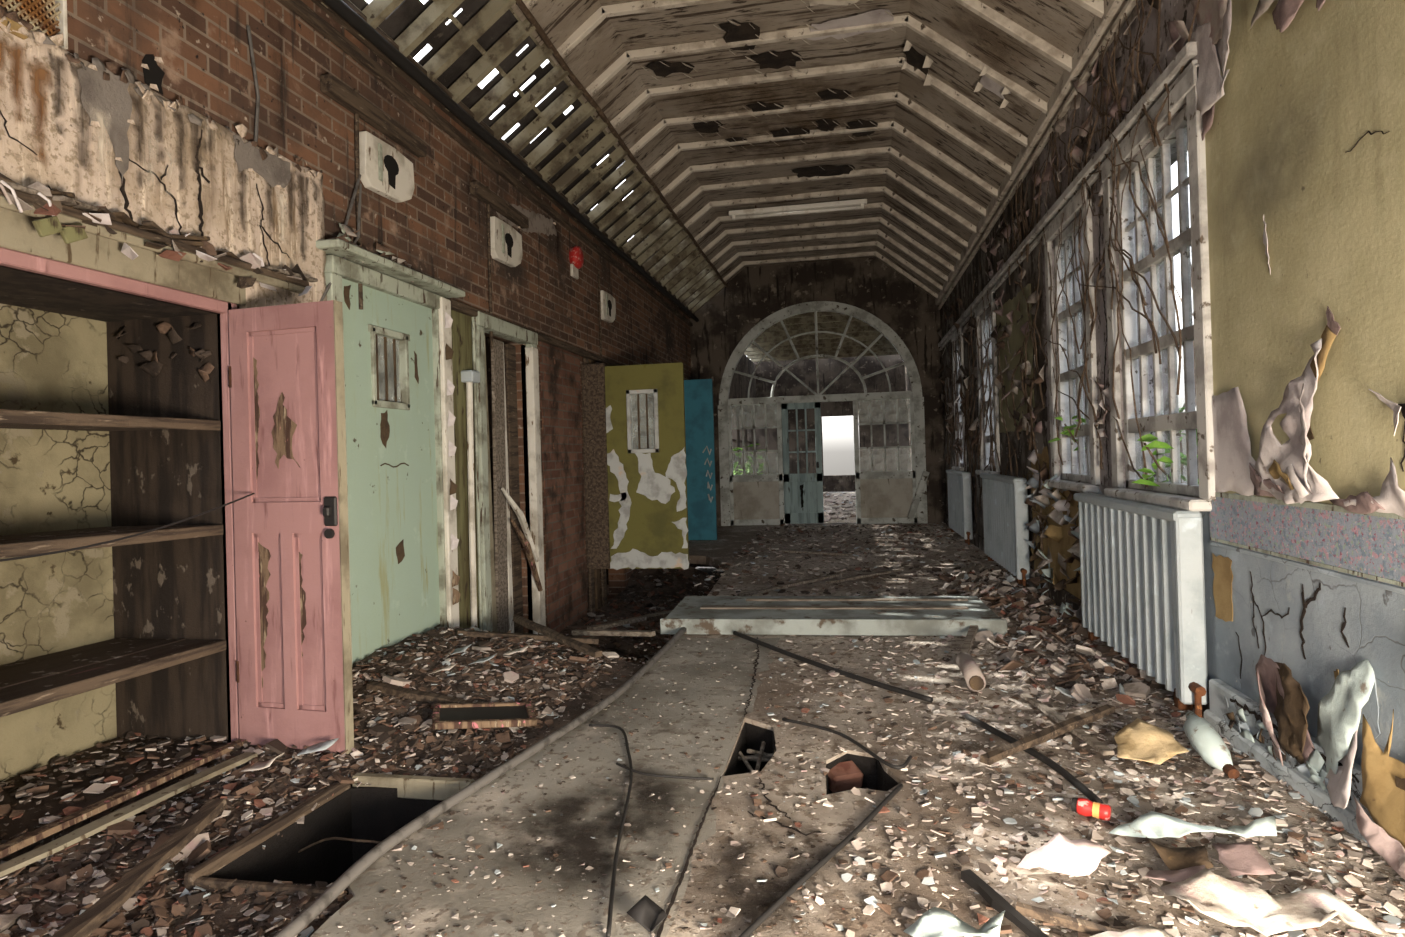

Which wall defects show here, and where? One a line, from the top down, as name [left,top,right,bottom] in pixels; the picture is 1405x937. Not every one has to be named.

water stain [50,54,103,165]
spalling [0,5,322,189]
water stain [131,95,212,188]
peeling [1123,0,1232,141]
peeling [1250,0,1326,33]
water stain [267,172,318,260]
peeling [937,56,1138,620]
peeling [607,447,689,570]
crack [1230,571,1359,800]
peeling [1225,654,1381,790]